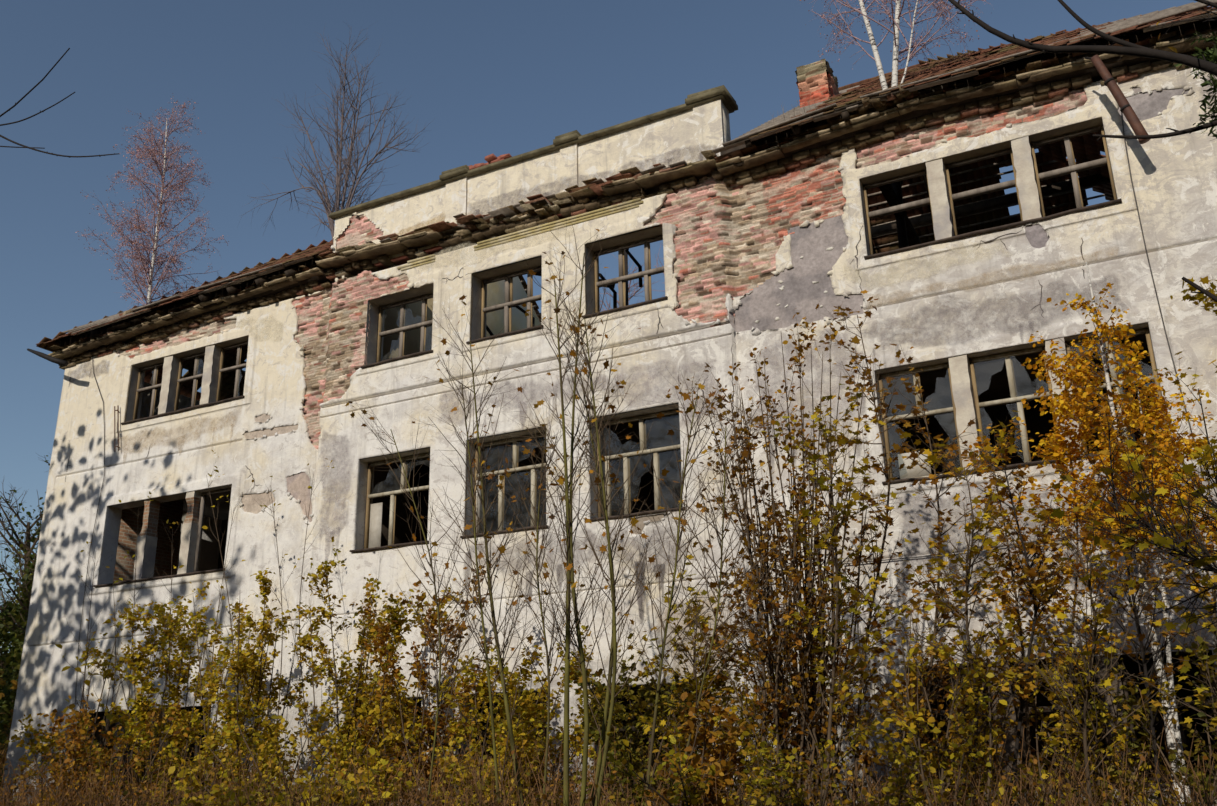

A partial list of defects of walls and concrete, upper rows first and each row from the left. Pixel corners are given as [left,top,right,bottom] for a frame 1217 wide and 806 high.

flaking render [1117,84,1195,122]
flaking render [644,86,1088,335]
flaking render [244,270,414,449]
flaking render [239,472,313,524]